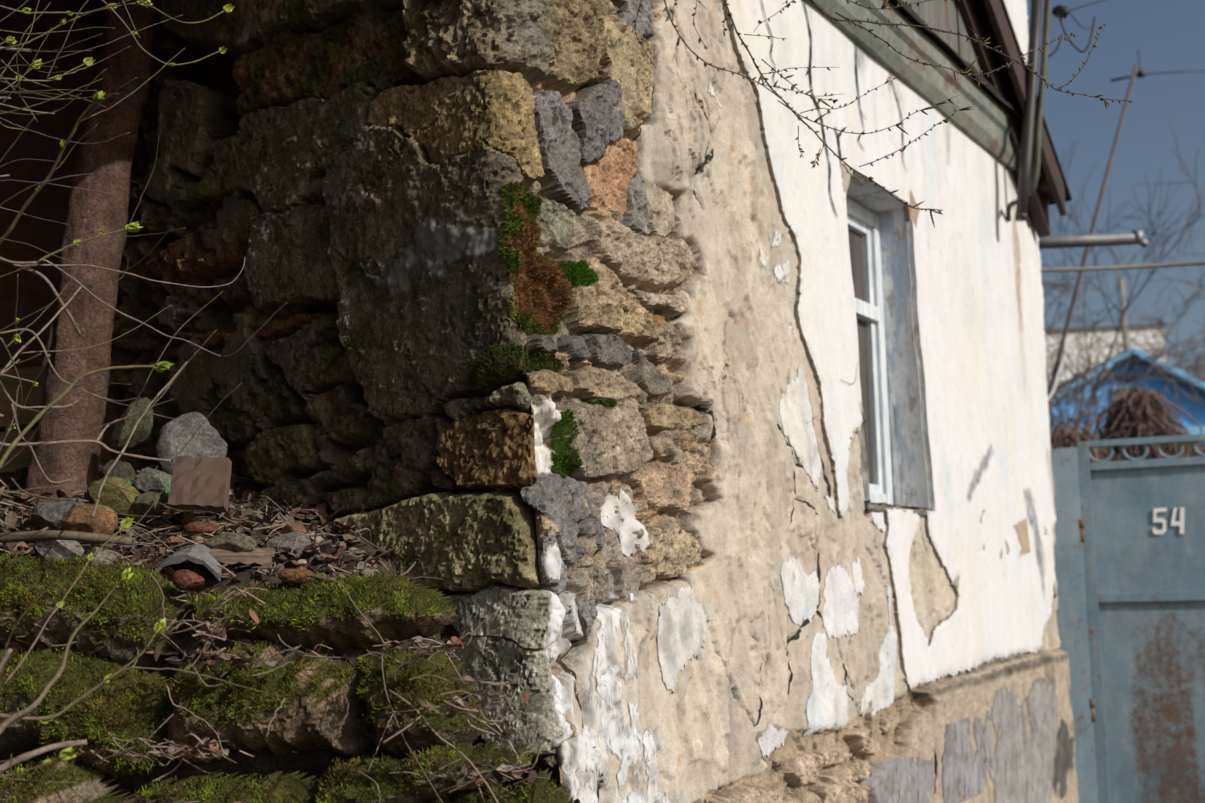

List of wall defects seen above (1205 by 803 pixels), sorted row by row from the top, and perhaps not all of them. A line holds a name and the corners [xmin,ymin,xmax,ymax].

spalling [497,0,1075,803]